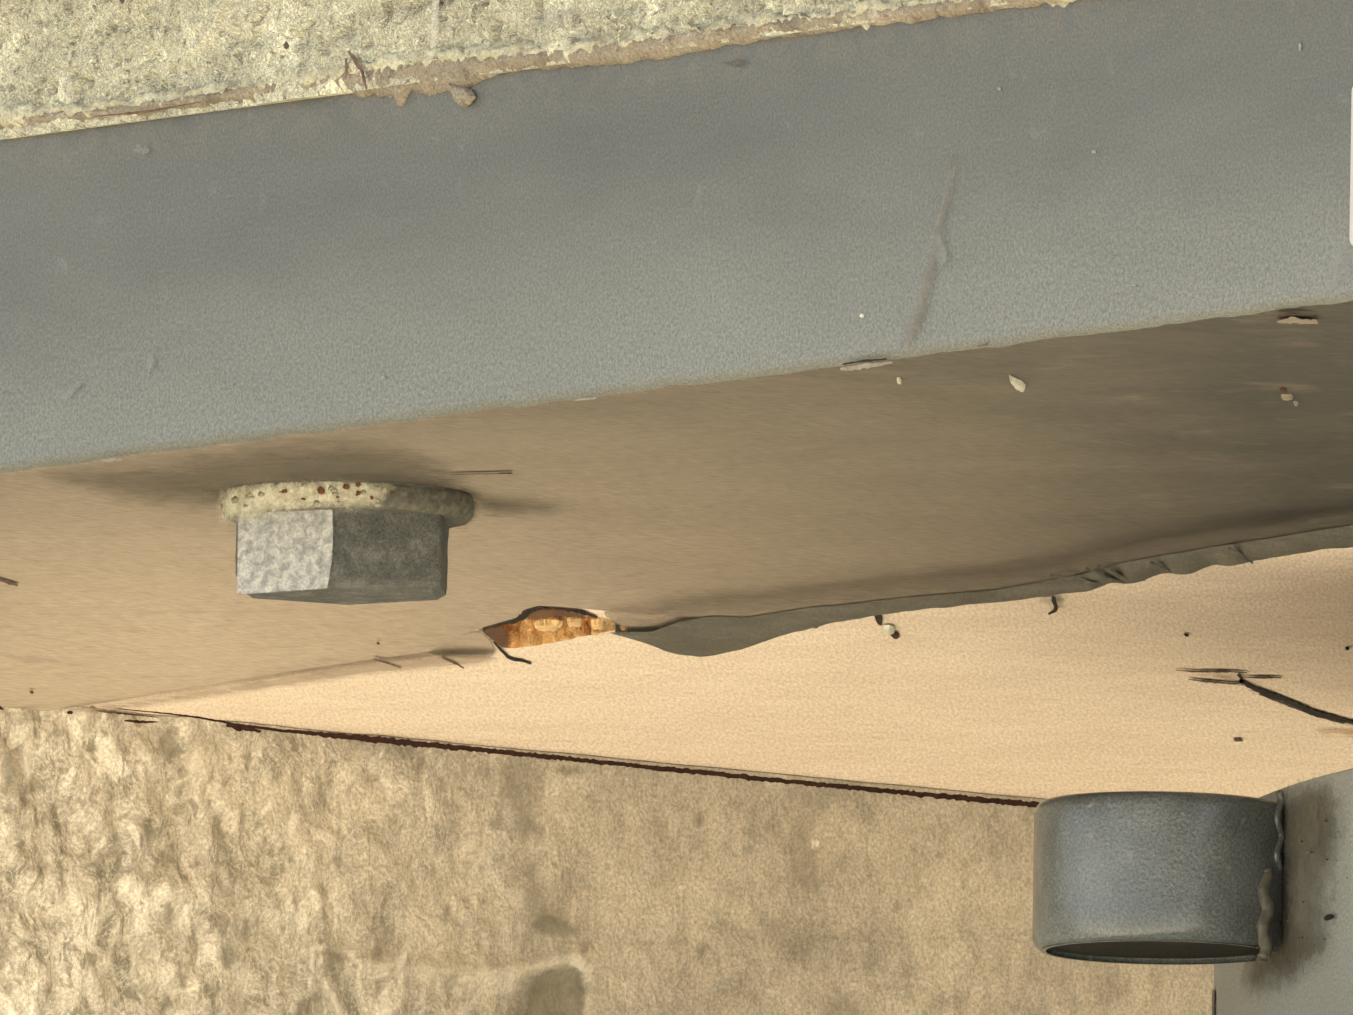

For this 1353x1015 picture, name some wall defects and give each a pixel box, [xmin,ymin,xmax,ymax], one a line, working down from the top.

spalling [479,606,629,664]
spalling [875,615,899,639]
crack [1177,670,1353,736]